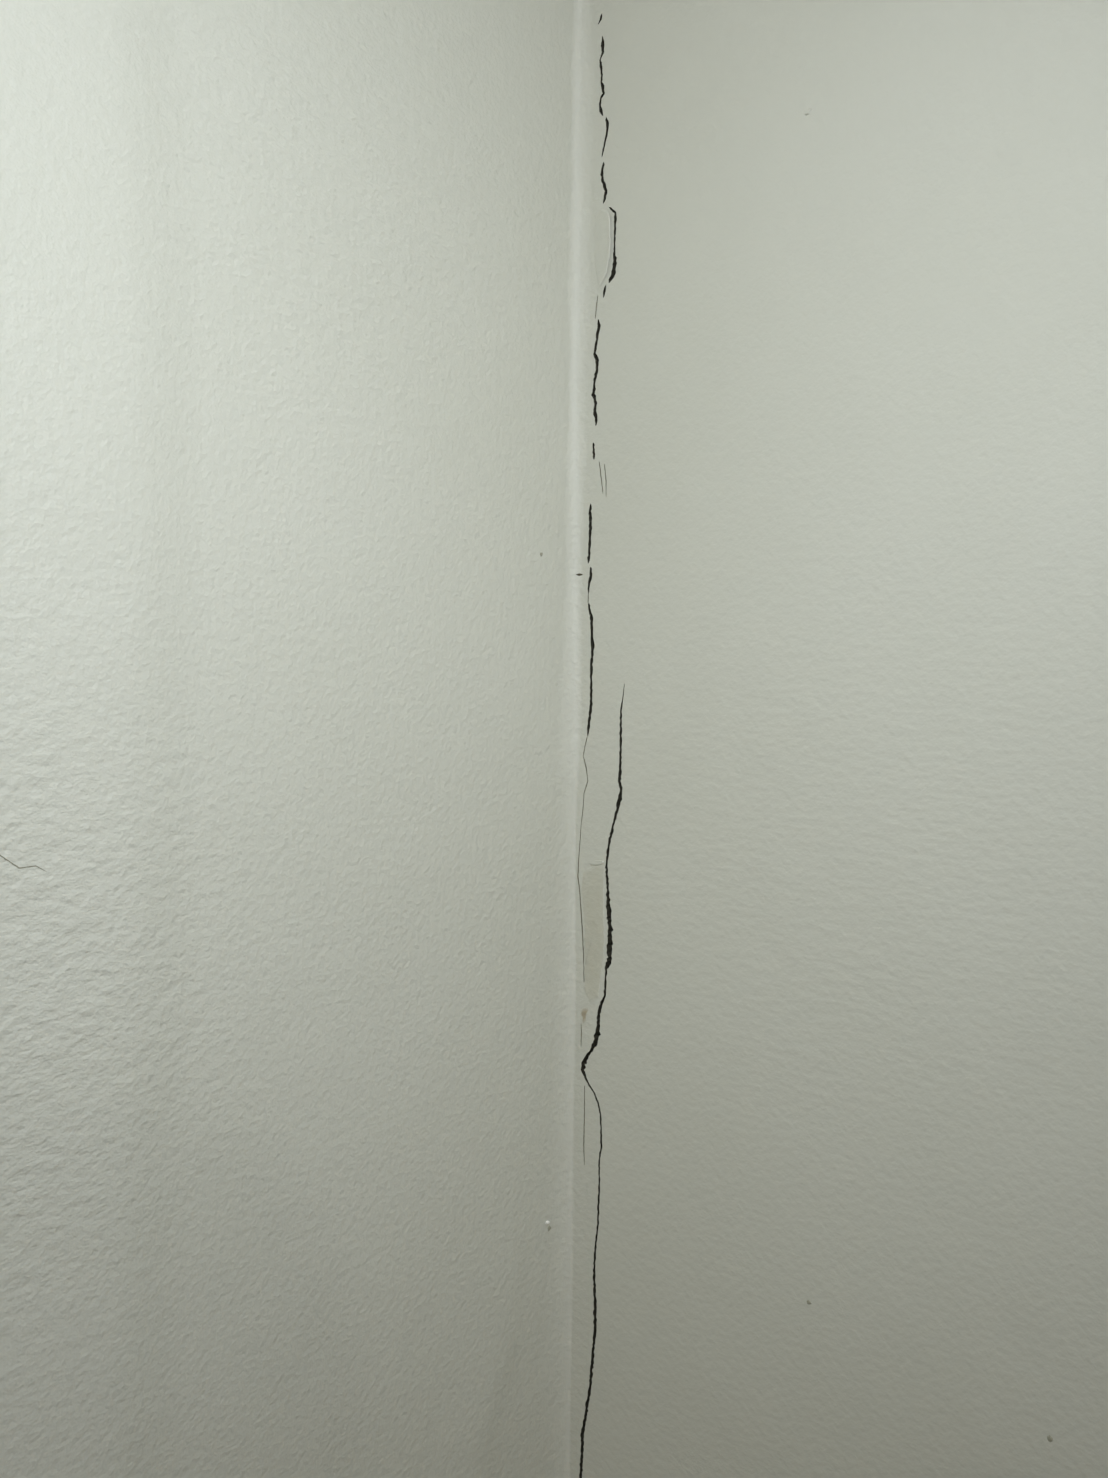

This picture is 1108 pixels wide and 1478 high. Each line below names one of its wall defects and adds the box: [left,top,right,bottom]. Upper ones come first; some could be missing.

crack [577,14,625,1478]